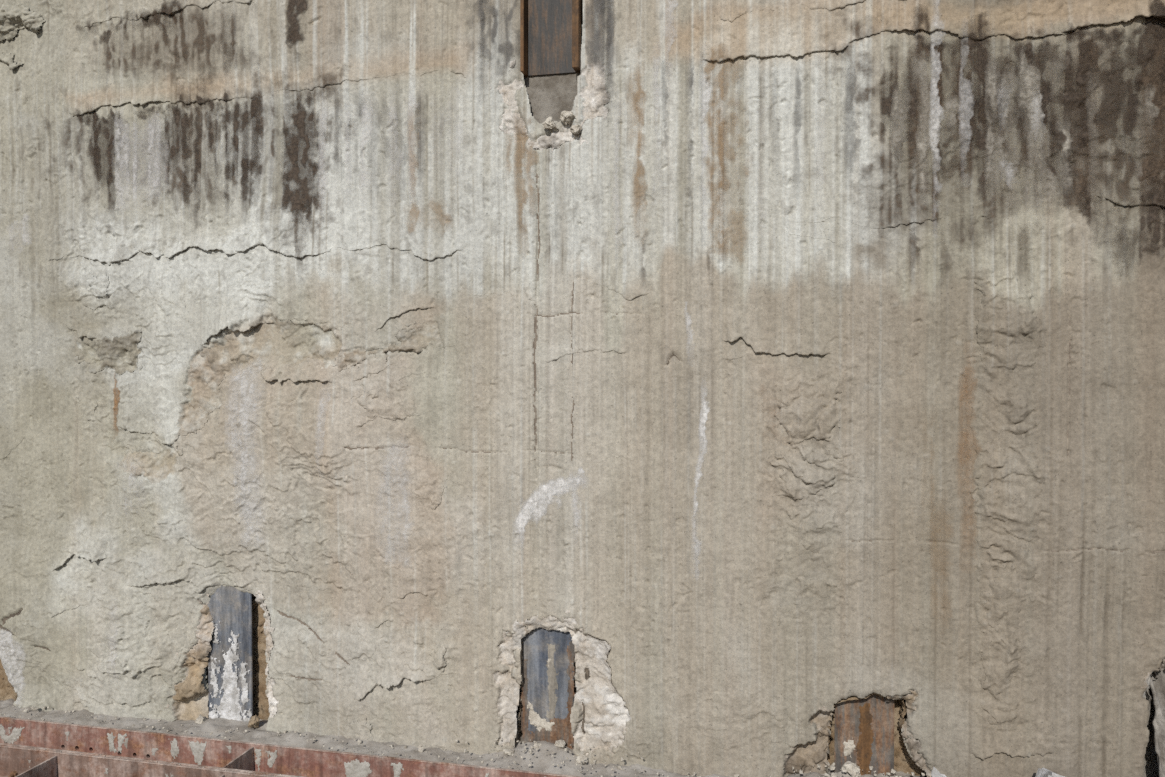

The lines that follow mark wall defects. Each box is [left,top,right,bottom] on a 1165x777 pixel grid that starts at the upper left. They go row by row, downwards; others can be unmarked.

water stain [65,77,335,238]
spalling [490,59,610,152]
peeling [699,0,1165,63]
water stain [846,0,1165,257]
spalling [121,547,285,722]
spalling [492,610,631,758]
spalling [784,706,833,775]
spalling [887,690,940,777]